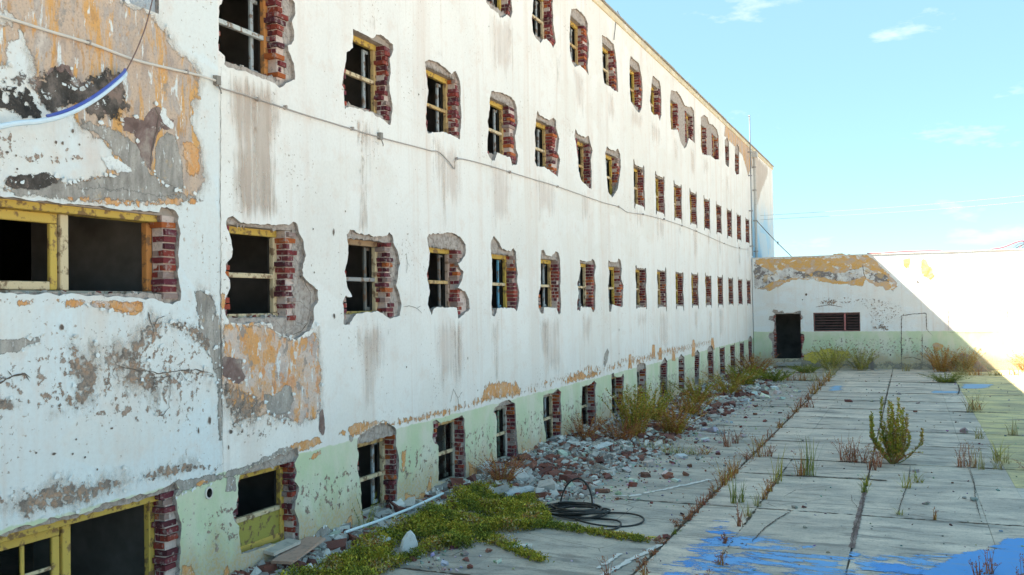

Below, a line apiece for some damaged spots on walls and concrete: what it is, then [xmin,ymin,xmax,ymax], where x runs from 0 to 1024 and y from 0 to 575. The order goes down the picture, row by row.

peeling [0,0,205,316]
peeling [0,217,325,450]
peeling [635,253,945,359]
flaking render [0,336,752,575]